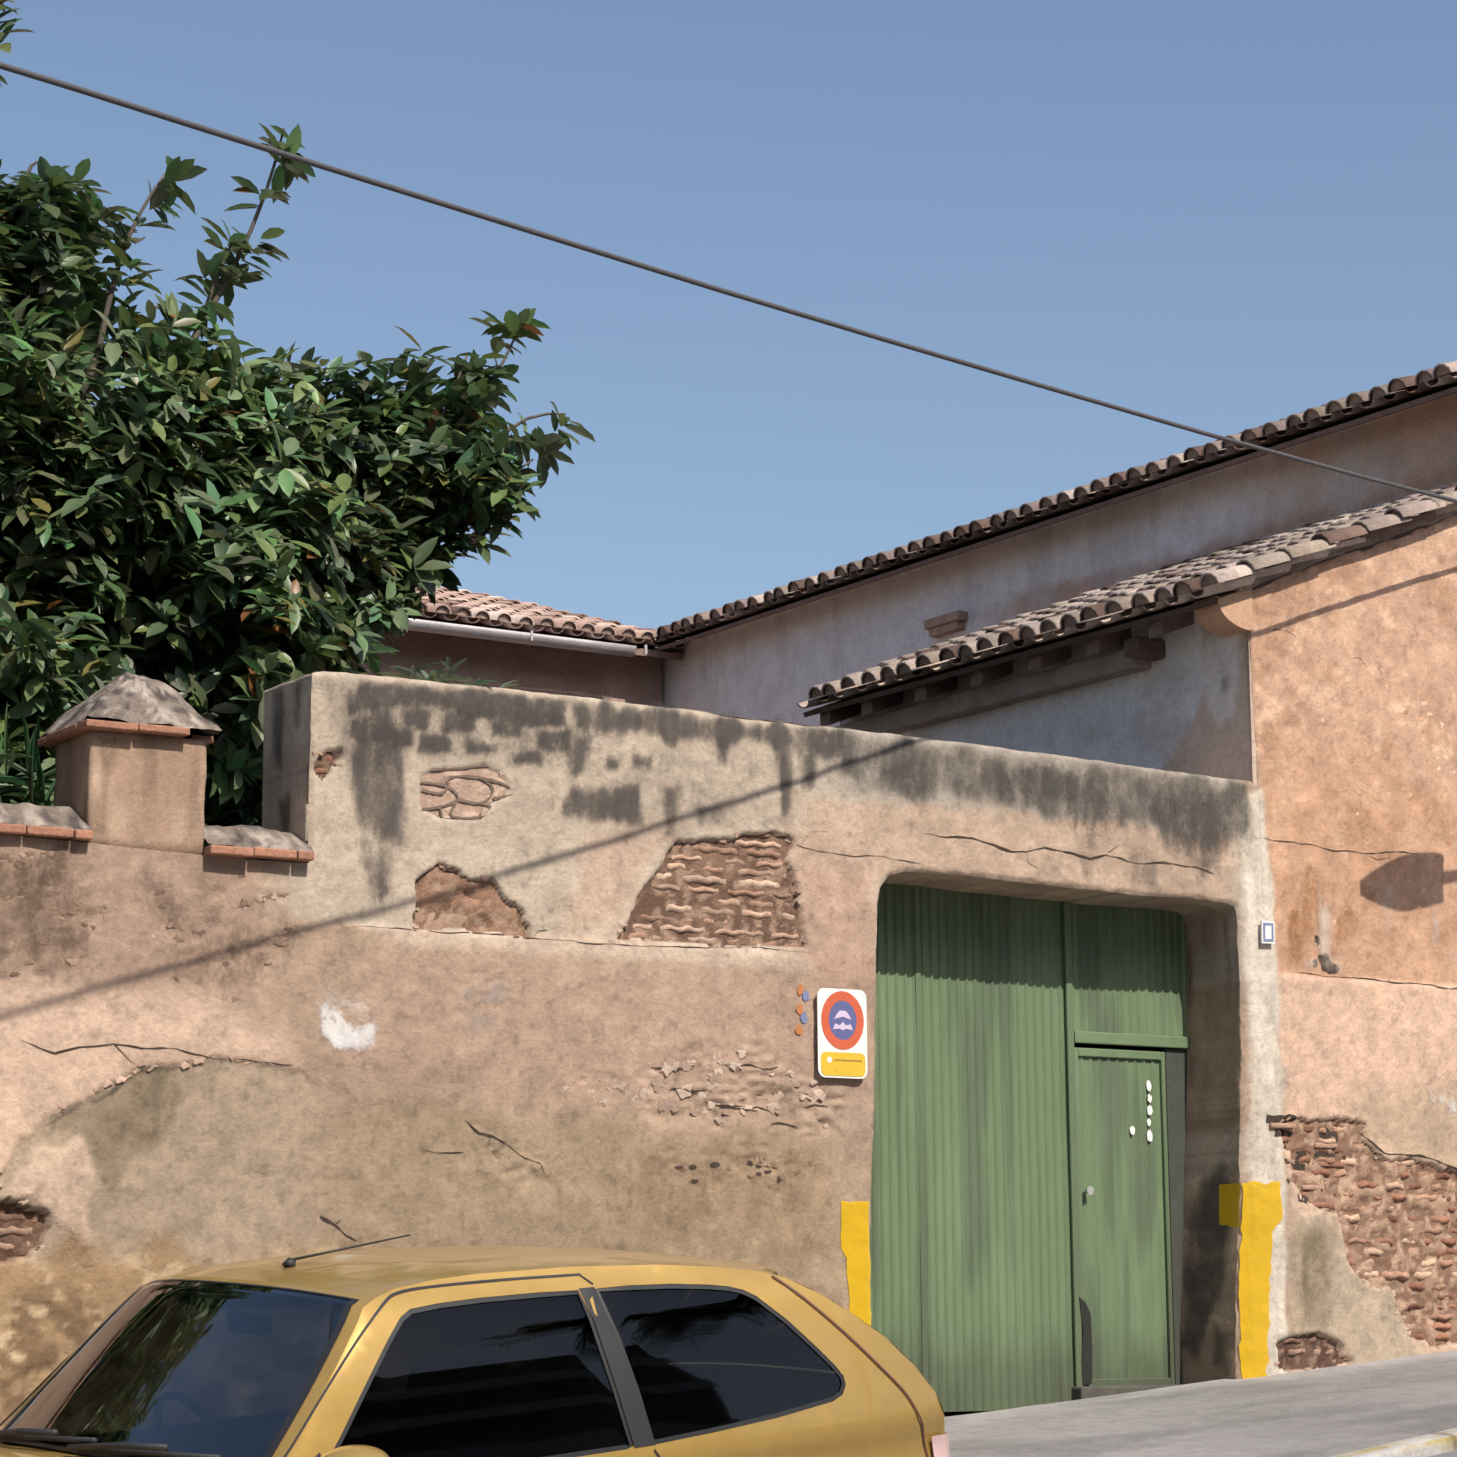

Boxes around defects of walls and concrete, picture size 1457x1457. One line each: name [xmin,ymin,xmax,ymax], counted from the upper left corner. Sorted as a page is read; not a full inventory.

spalling [420,764,513,821]
water stain [349,682,860,839]
water stain [880,735,1248,865]
spalling [412,863,528,939]
spalling [608,831,805,948]
crack [788,831,1213,874]
crack [1251,838,1416,860]
crack [21,1040,285,1066]
spalling [0,1169,46,1261]
water stain [1183,1170,1228,1364]
spalling [1266,1113,1457,1347]
spalling [1274,1333,1348,1371]